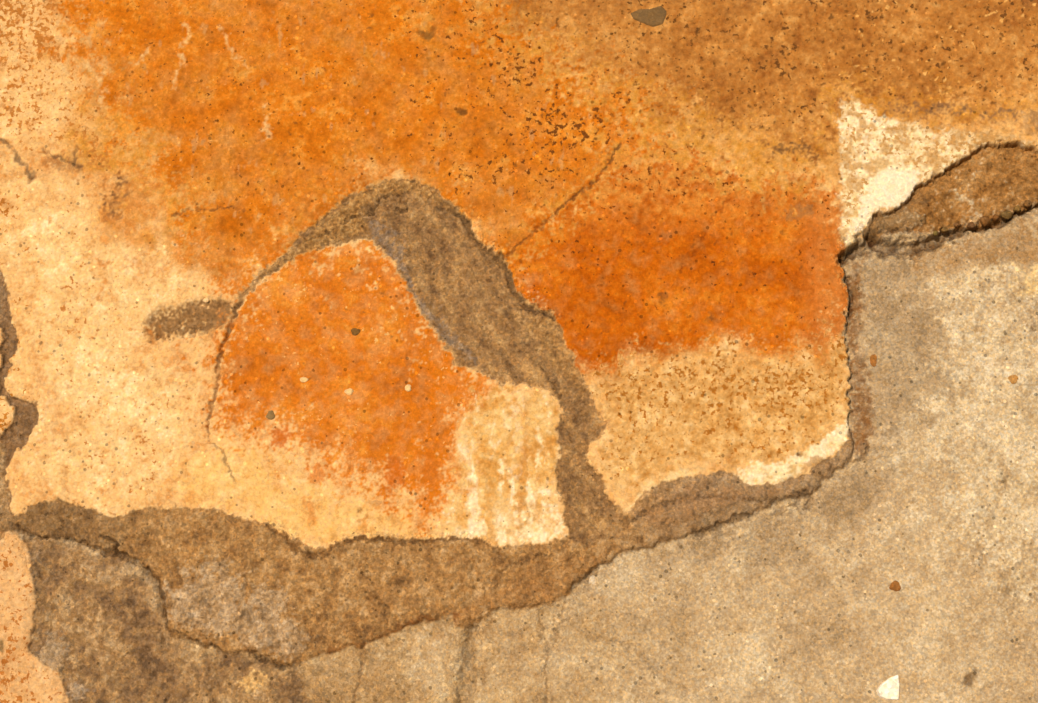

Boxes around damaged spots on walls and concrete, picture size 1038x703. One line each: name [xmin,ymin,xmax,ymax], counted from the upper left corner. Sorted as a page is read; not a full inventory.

crack [0,135,88,191]
crack [297,188,412,248]
corrosion [0,0,877,539]
crack [438,135,628,326]
crack [830,195,1038,326]
peeling [833,91,1038,240]
peeling [0,181,232,517]
peeling [167,440,406,548]
spalling [244,178,716,543]
crack [531,356,570,404]
peeling [733,417,850,487]
spalling [28,541,314,703]